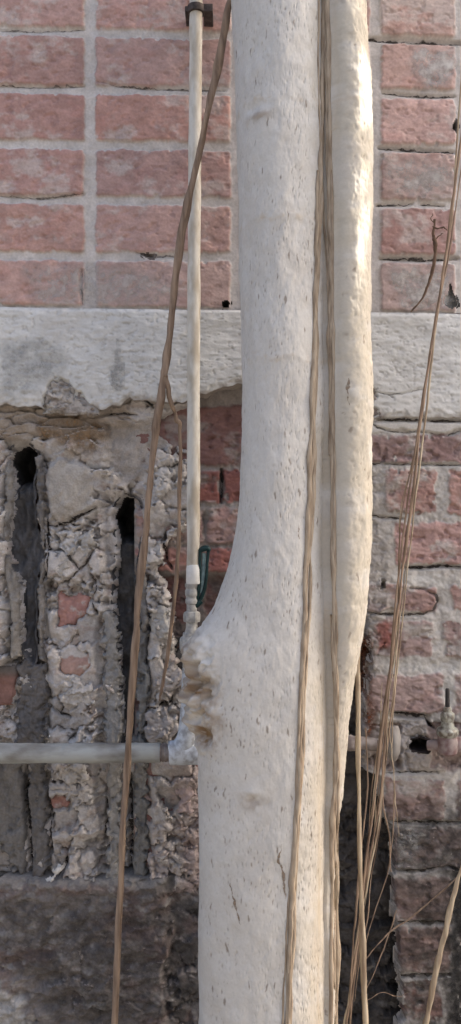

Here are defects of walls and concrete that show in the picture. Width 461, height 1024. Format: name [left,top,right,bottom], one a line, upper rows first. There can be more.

spalling [0,377,242,744]
spalling [0,761,199,893]